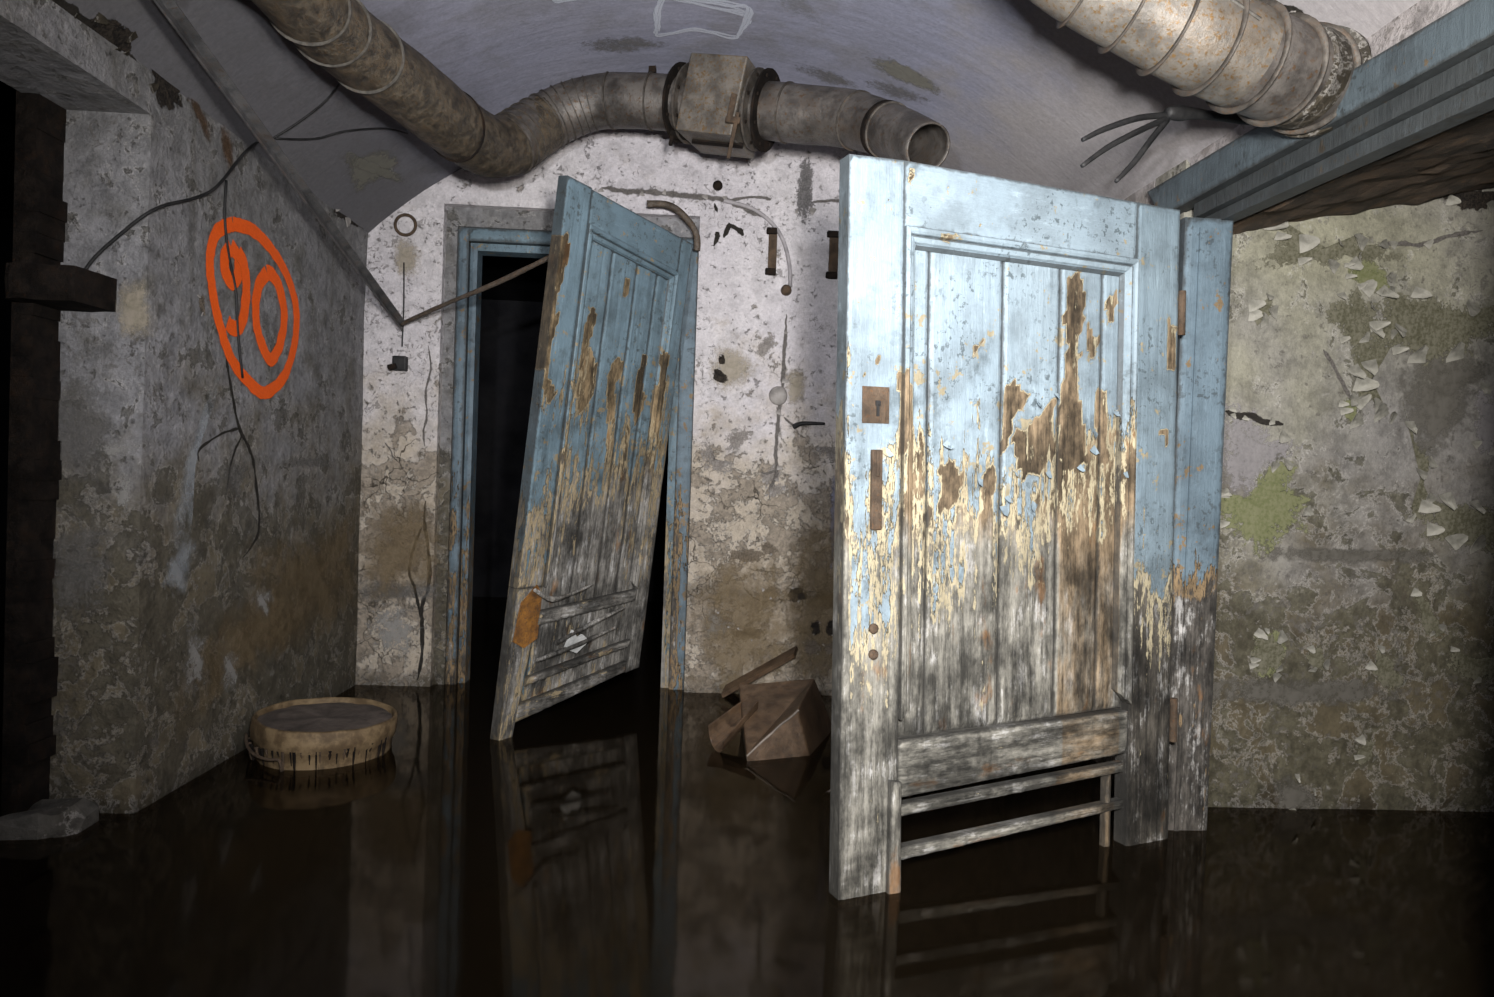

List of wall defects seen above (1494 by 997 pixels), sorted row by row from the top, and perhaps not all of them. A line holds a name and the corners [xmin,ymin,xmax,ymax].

spalling [90,12,138,52]
spalling [1438,188,1494,213]
peeling [1248,293,1279,328]
peeling [1253,221,1494,558]
peeling [1220,403,1314,557]
leakage [704,476,835,688]